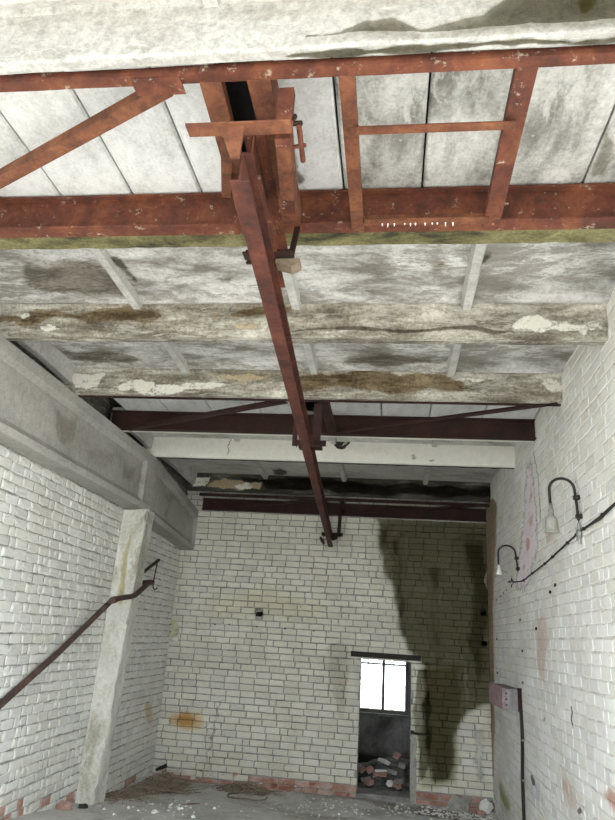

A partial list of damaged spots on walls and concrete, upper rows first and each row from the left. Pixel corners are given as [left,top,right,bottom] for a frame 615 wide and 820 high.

spalling [71,372,106,390]
spalling [113,379,226,396]
water stain [241,469,313,490]
water stain [321,478,491,498]
water stain [377,519,490,780]